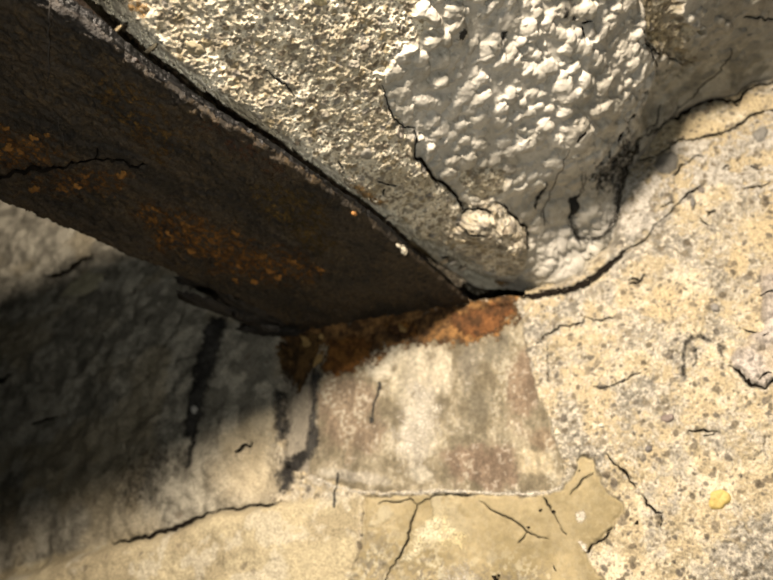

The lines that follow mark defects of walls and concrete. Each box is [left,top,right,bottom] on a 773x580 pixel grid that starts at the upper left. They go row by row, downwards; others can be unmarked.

corrosion [0,123,136,198]
spalling [85,0,507,289]
crack [382,85,529,250]
crack [638,81,773,175]
crack [743,165,768,189]
crack [503,186,701,299]
peeling [224,309,306,337]
corrosion [276,280,523,393]
leakage [273,389,291,441]
leakage [276,368,324,493]
crack [378,493,566,580]
crack [607,454,662,529]